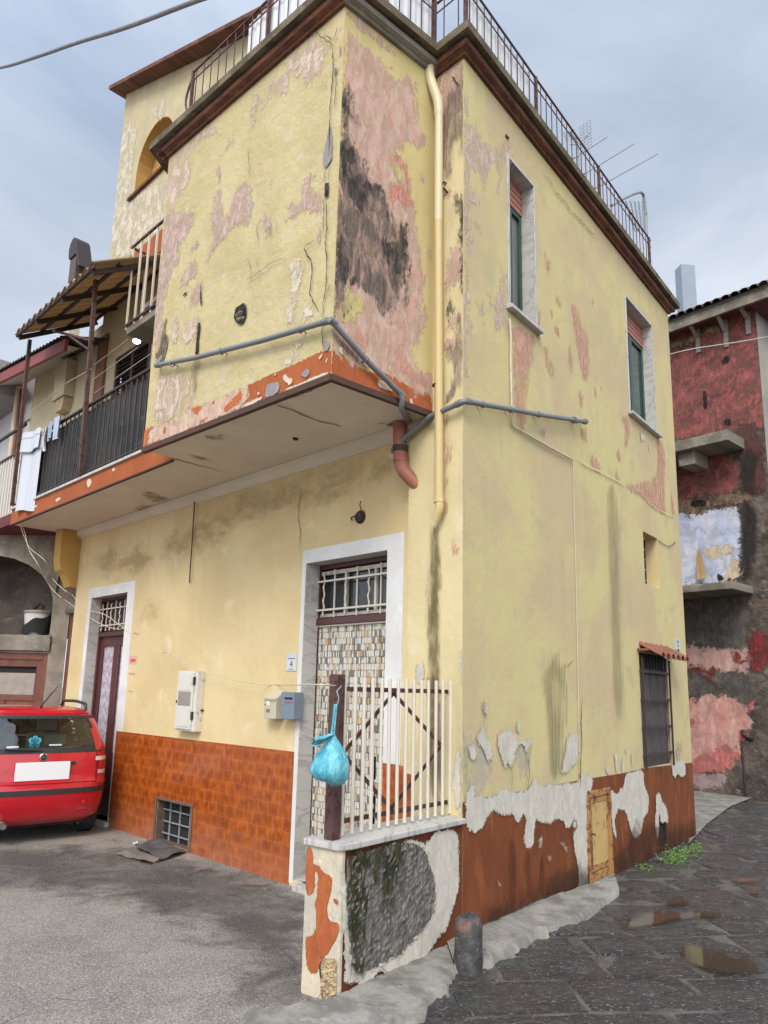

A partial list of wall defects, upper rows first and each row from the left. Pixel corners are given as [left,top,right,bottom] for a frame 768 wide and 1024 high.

peeling [111,12,432,447]
crack [245,29,337,346]
mould [334,87,411,318]
peeling [438,62,513,378]
crack [277,390,388,428]
peeling [512,296,603,433]
water stain [429,528,441,794]
spalling [301,721,593,1000]
peeling [606,749,668,839]
spalling [671,599,768,792]
peeling [700,544,744,582]